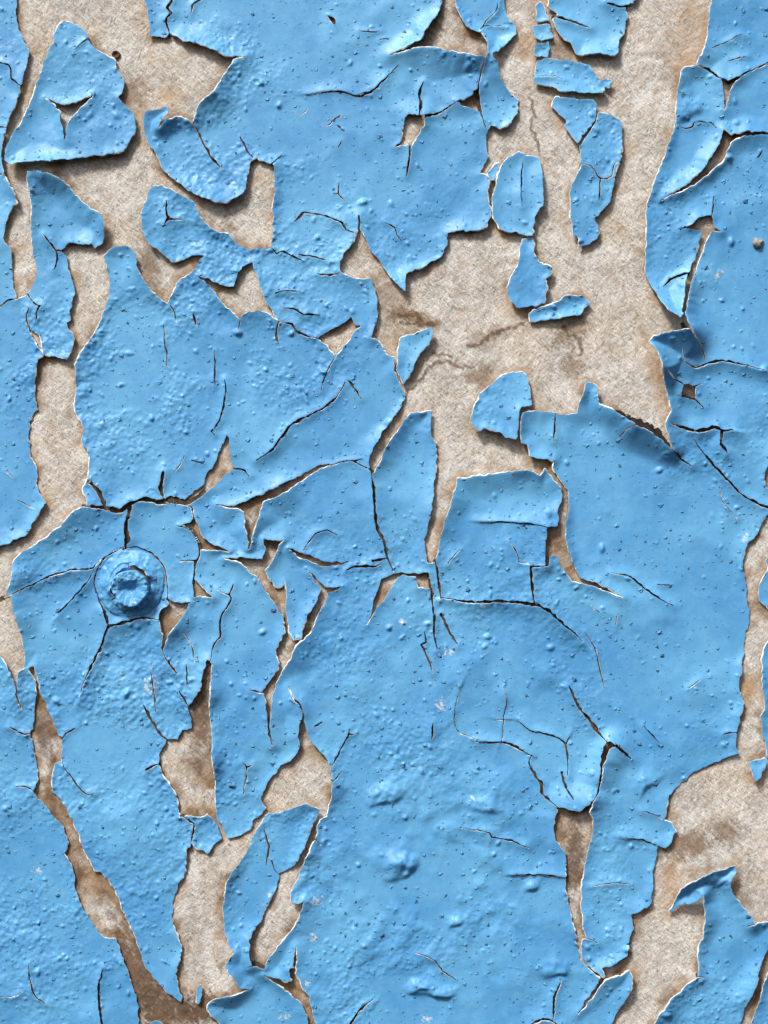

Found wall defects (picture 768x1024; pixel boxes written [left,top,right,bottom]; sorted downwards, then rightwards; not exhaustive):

crack [211,351,227,436]
crack [234,290,345,476]
peeling [319,317,361,355]
peeling [340,0,768,618]
crack [615,322,768,514]
crack [0,458,234,770]
peeling [0,0,348,1024]
crack [333,459,393,571]
crack [420,521,617,688]
crack [431,684,631,807]
peeling [554,515,768,1024]
crack [532,982,561,1024]